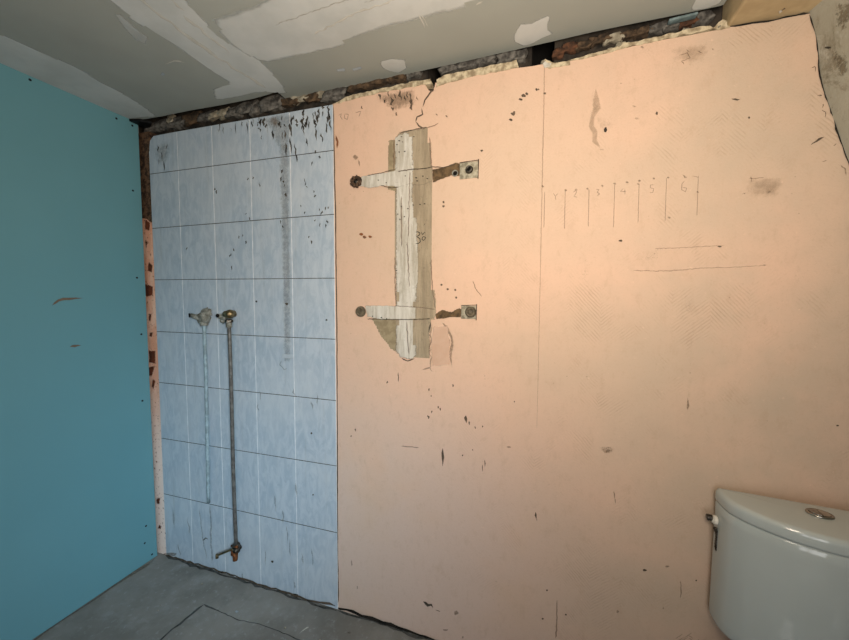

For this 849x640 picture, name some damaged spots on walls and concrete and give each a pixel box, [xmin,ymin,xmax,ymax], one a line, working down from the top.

spalling [541,19,730,69]
spalling [333,60,519,116]
leakage [235,105,331,165]
crack [368,90,455,188]